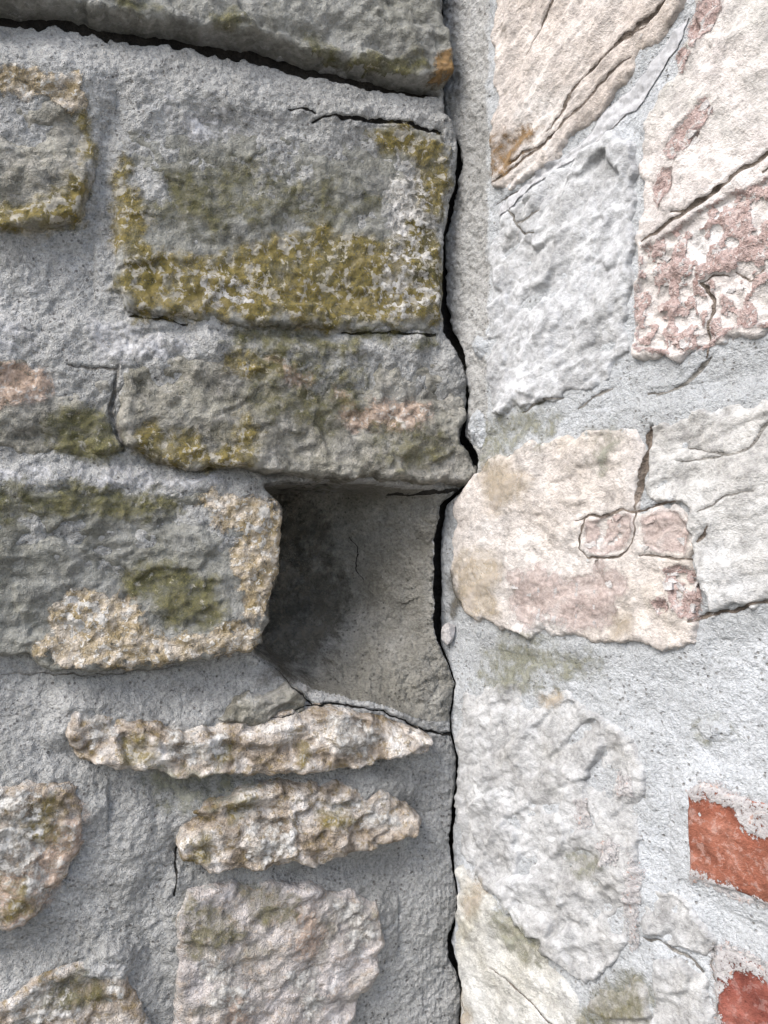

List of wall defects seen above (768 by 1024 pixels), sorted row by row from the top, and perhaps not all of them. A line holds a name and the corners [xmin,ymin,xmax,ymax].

crack [0,18,479,1024]
crack [575,427,753,568]
crack [675,421,768,462]